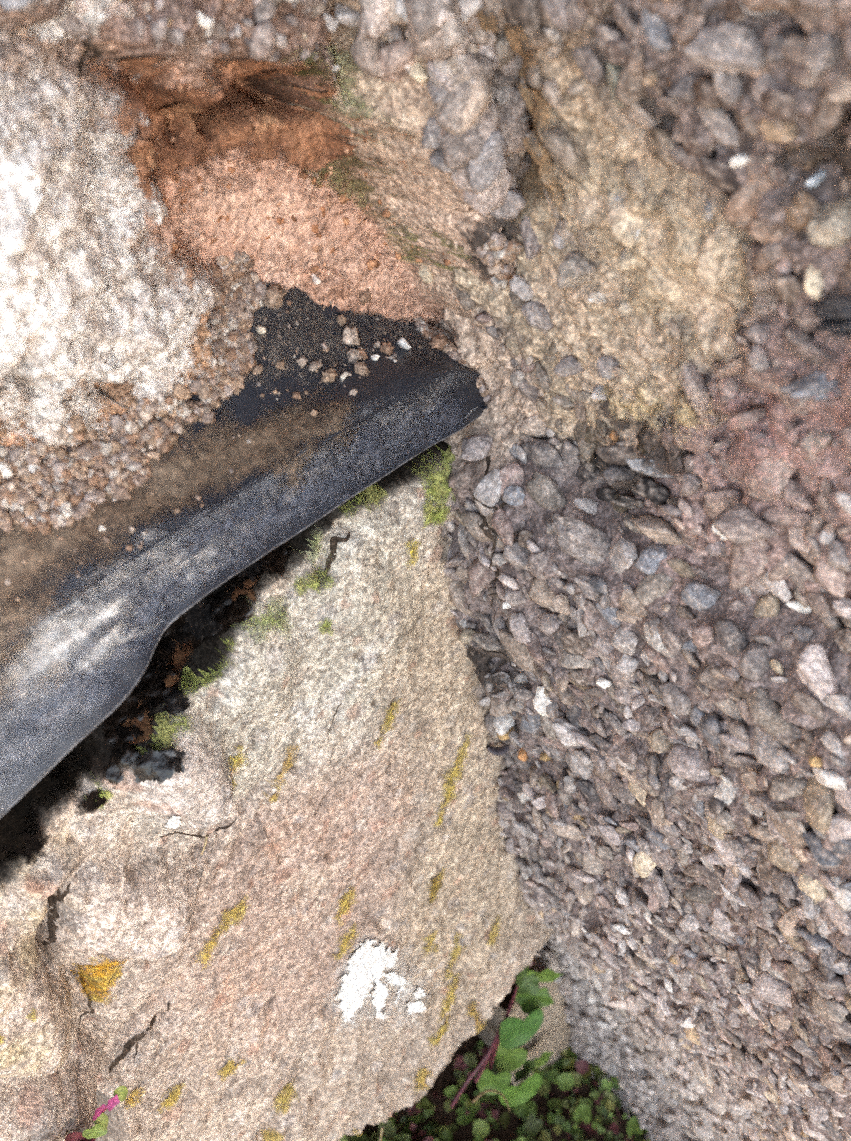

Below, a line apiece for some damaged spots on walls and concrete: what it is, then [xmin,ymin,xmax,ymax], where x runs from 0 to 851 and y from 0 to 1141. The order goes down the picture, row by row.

corrosion [124,148,445,323]
crack [109,1002,170,1073]